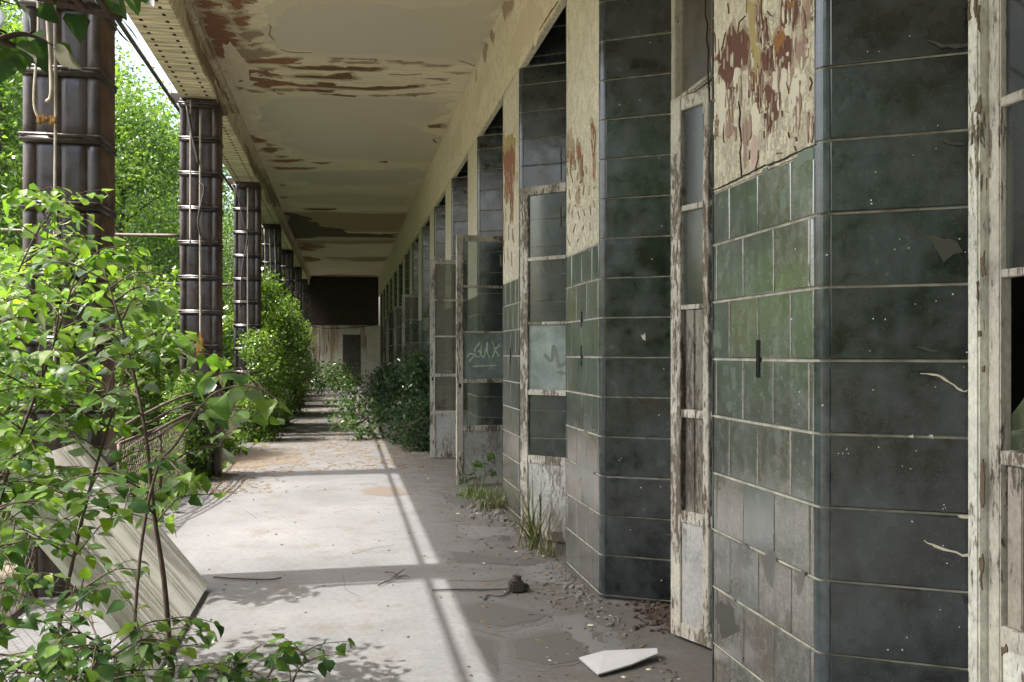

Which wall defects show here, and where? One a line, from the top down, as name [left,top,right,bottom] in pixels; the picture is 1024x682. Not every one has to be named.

peeling [193,0,319,95]
peeling [325,57,472,97]
corrosion [503,129,516,162]
peeling [712,0,814,175]
crack [712,77,817,190]